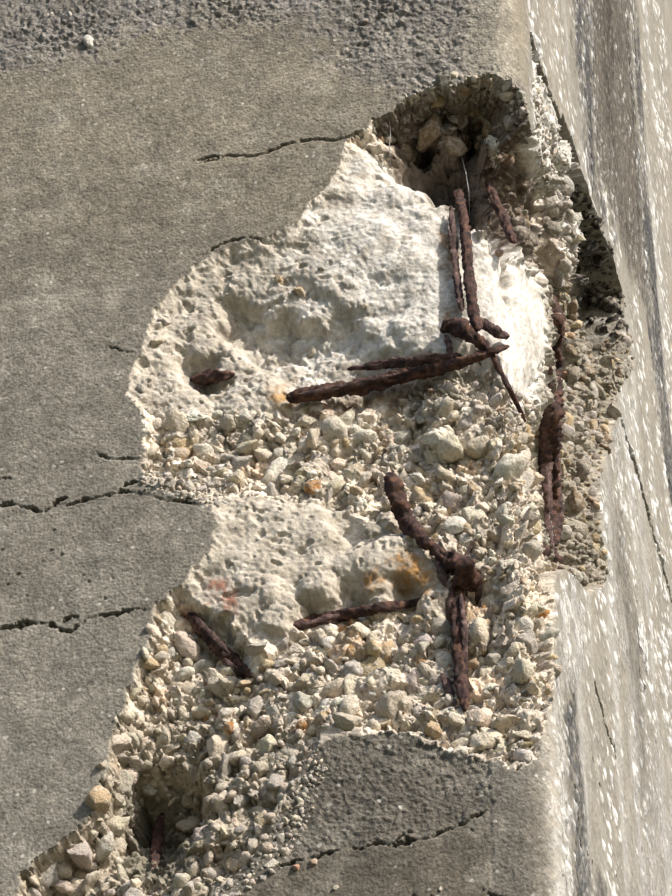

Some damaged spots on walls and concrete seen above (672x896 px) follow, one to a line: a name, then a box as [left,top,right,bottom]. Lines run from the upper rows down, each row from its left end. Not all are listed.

crack [196,130,358,164]
corrosion [481,317,510,340]
corrosion [271,334,462,418]
crack [0,452,205,514]
spalling [125,40,641,896]
corrosion [537,366,565,550]
crack [0,607,149,634]
corrosion [182,611,246,679]
corrosion [301,613,345,627]
corrosion [388,537,484,665]
corrosion [440,673,458,707]
crack [273,809,487,869]